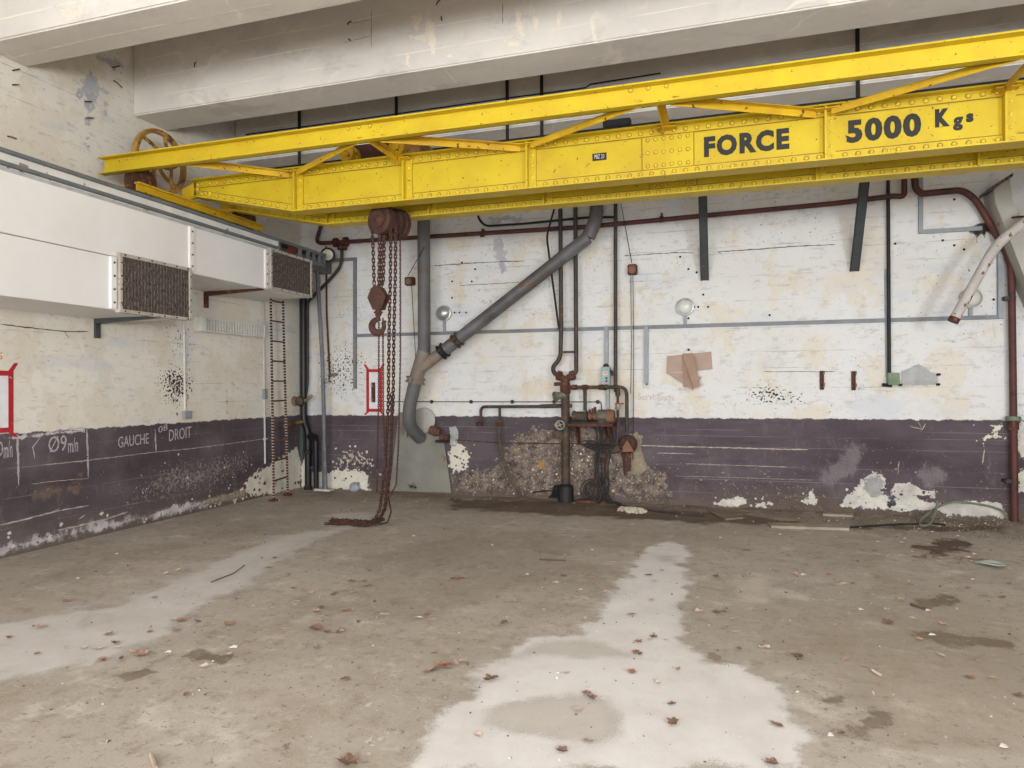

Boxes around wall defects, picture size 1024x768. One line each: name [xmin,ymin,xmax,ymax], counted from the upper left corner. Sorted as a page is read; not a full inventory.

leakage [158,325,194,415]
leakage [318,340,367,400]
leakage [746,385,802,405]
leakage [0,487,240,556]
peeling [127,445,382,508]
peeling [447,422,673,503]
peeling [801,489,818,505]
peeling [839,471,1005,519]
peeling [976,421,1024,492]
leakage [0,511,386,683]
leakage [402,541,1024,768]